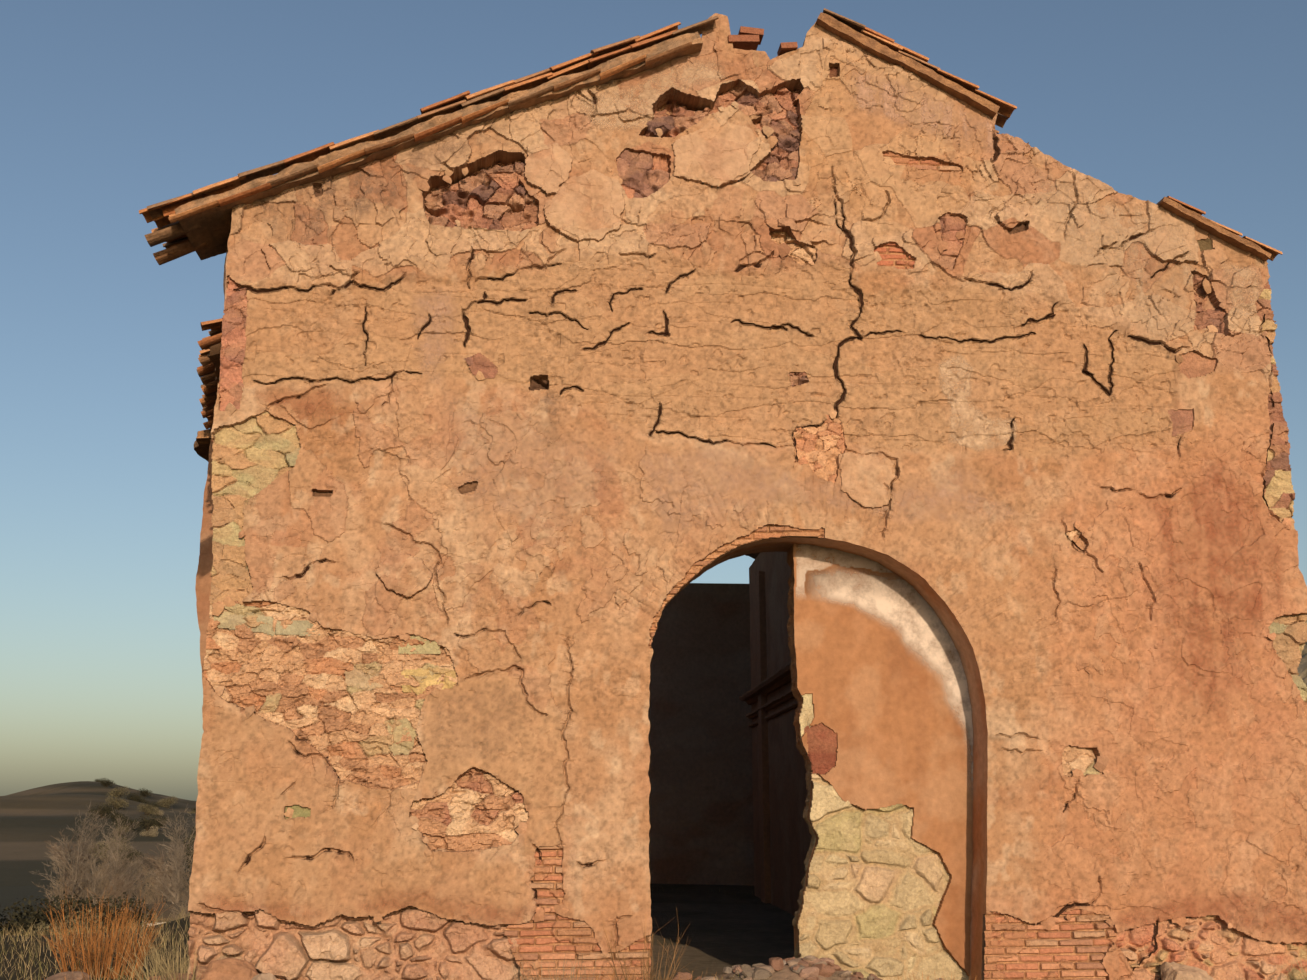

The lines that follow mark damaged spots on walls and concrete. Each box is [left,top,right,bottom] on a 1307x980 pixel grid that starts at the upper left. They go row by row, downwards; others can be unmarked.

spalling [417,160,539,232]
spalling [613,77,810,198]
crack [233,277,422,404]
crack [462,253,694,349]
crack [649,200,1056,462]
crack [1083,330,1179,395]
crack [1261,314,1274,509]
spalling [203,277,529,857]
damp [796,544,973,746]
spalling [187,845,652,980]
spalling [798,694,1307,980]
crack [1037,881,1099,925]